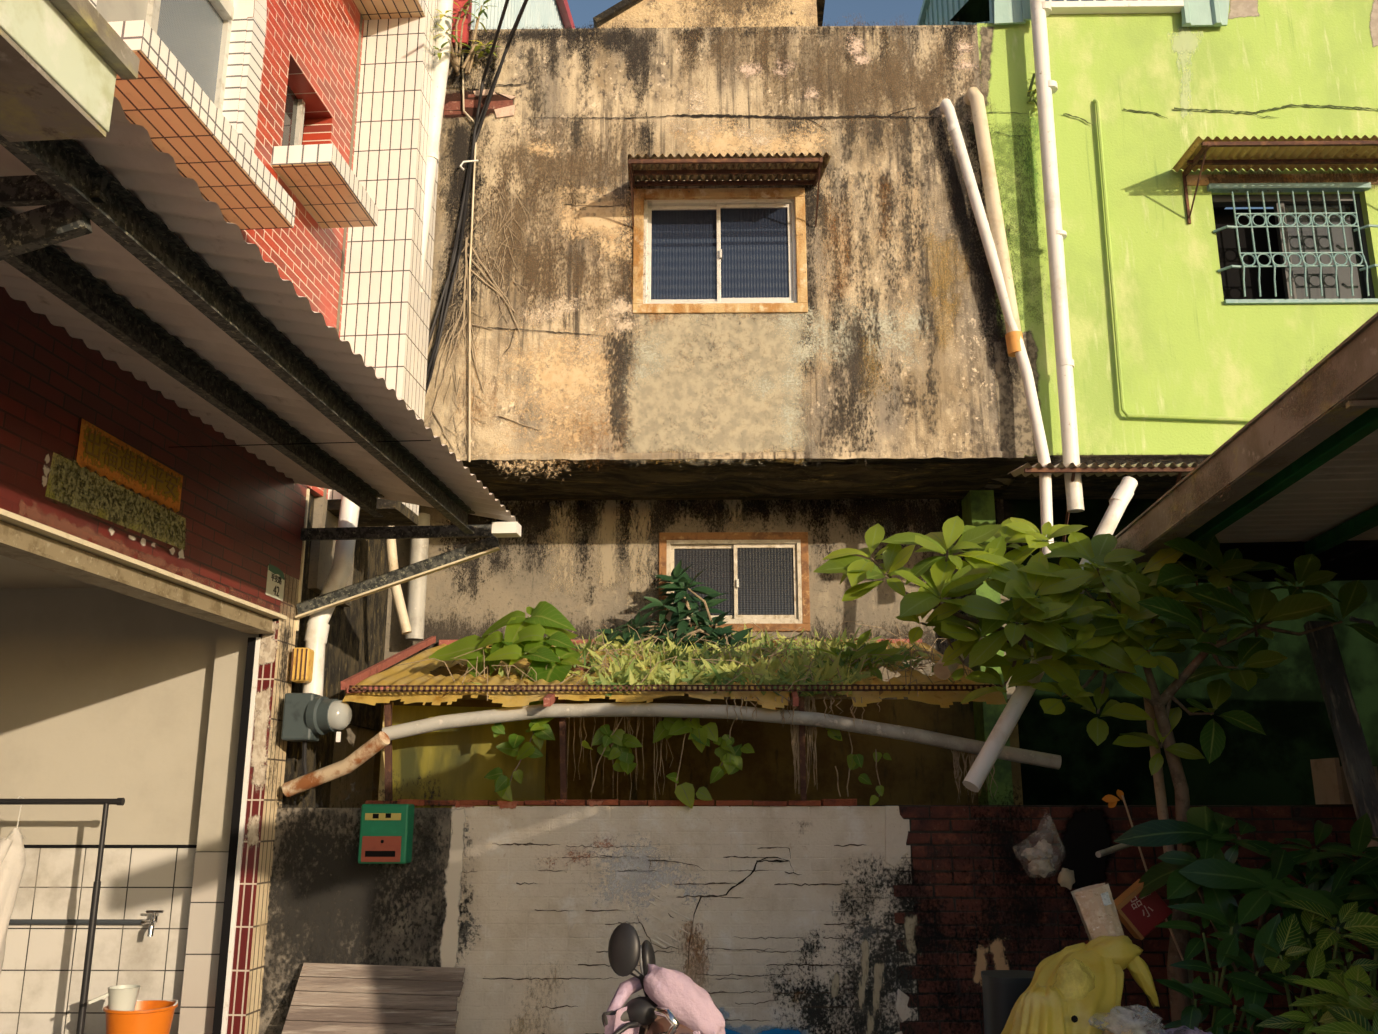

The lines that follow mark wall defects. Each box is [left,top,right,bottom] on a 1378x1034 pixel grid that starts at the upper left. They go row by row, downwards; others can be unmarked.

peeling [1228,0,1259,19]
peeling [1370,0,1378,47]
leakage [434,0,1050,463]
leakage [414,499,965,655]
leakage [810,617,954,664]
leakage [994,499,1017,525]
mould [259,776,482,1033]
crack [462,843,883,1034]
leakage [766,785,1081,1034]